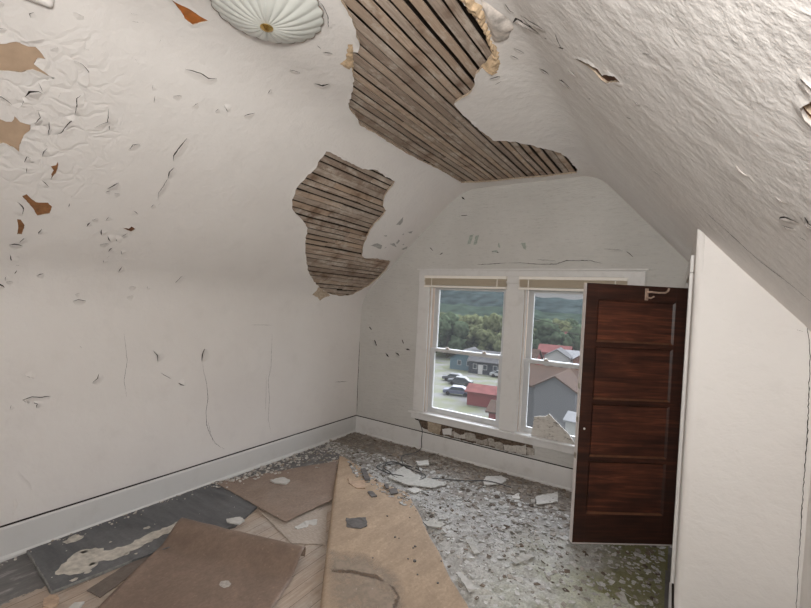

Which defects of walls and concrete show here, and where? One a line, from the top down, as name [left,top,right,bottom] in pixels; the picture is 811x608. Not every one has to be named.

peeling [168,0,211,28]
flaking render [338,0,360,53]
peeling [0,22,89,188]
flaking render [346,68,464,184]
flaking render [454,68,580,175]
peeling [791,69,811,129]
peeling [0,192,56,291]
flaking render [290,150,412,297]
flaking render [415,418,535,455]